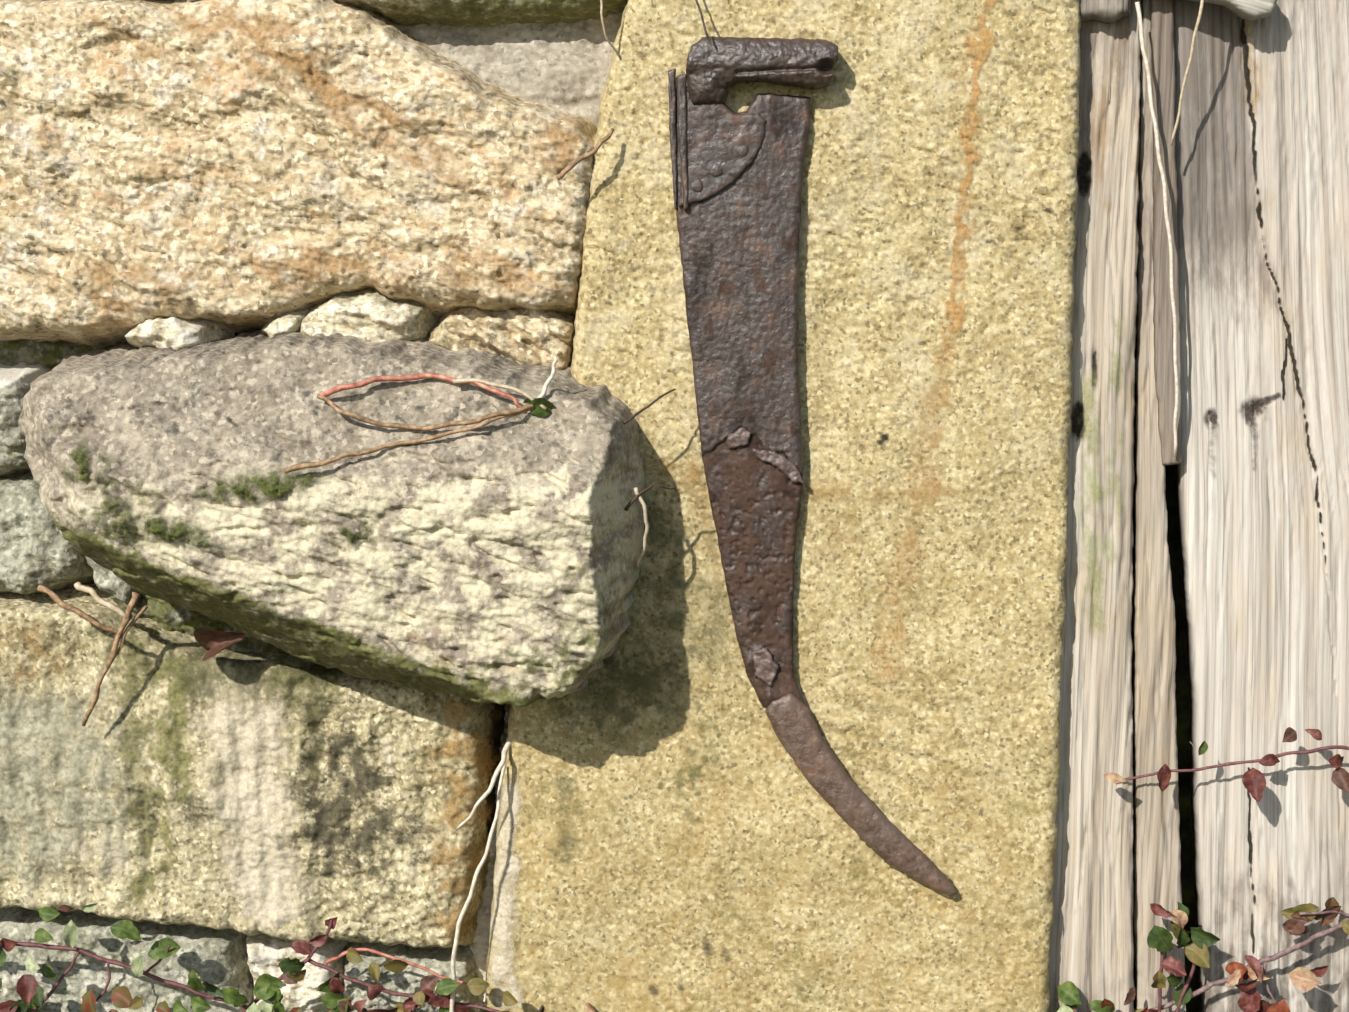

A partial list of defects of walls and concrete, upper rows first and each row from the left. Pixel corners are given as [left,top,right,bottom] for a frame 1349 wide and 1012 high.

rust [942,0,997,333]
damp [98,659,301,927]
damp [304,743,323,780]
damp [380,740,393,776]